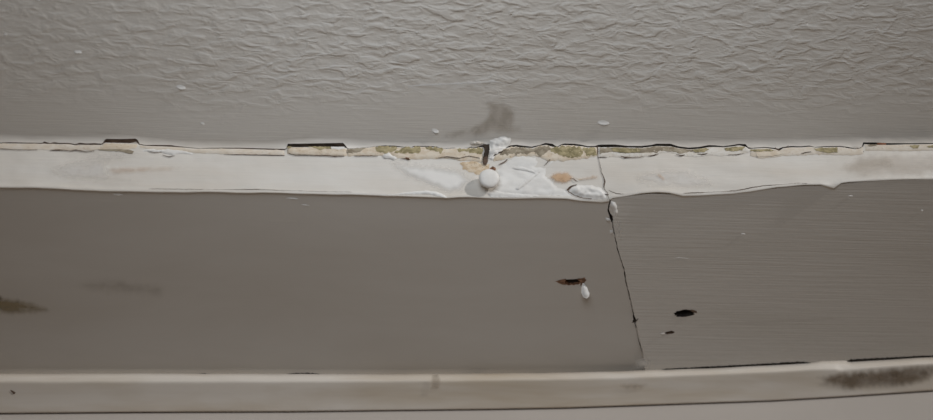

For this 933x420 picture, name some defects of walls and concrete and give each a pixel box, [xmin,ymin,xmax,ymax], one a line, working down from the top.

crack [4,139,484,150]
peeling [0,143,933,175]
flaking render [567,184,606,200]
crack [506,142,933,370]
damp [827,369,932,387]